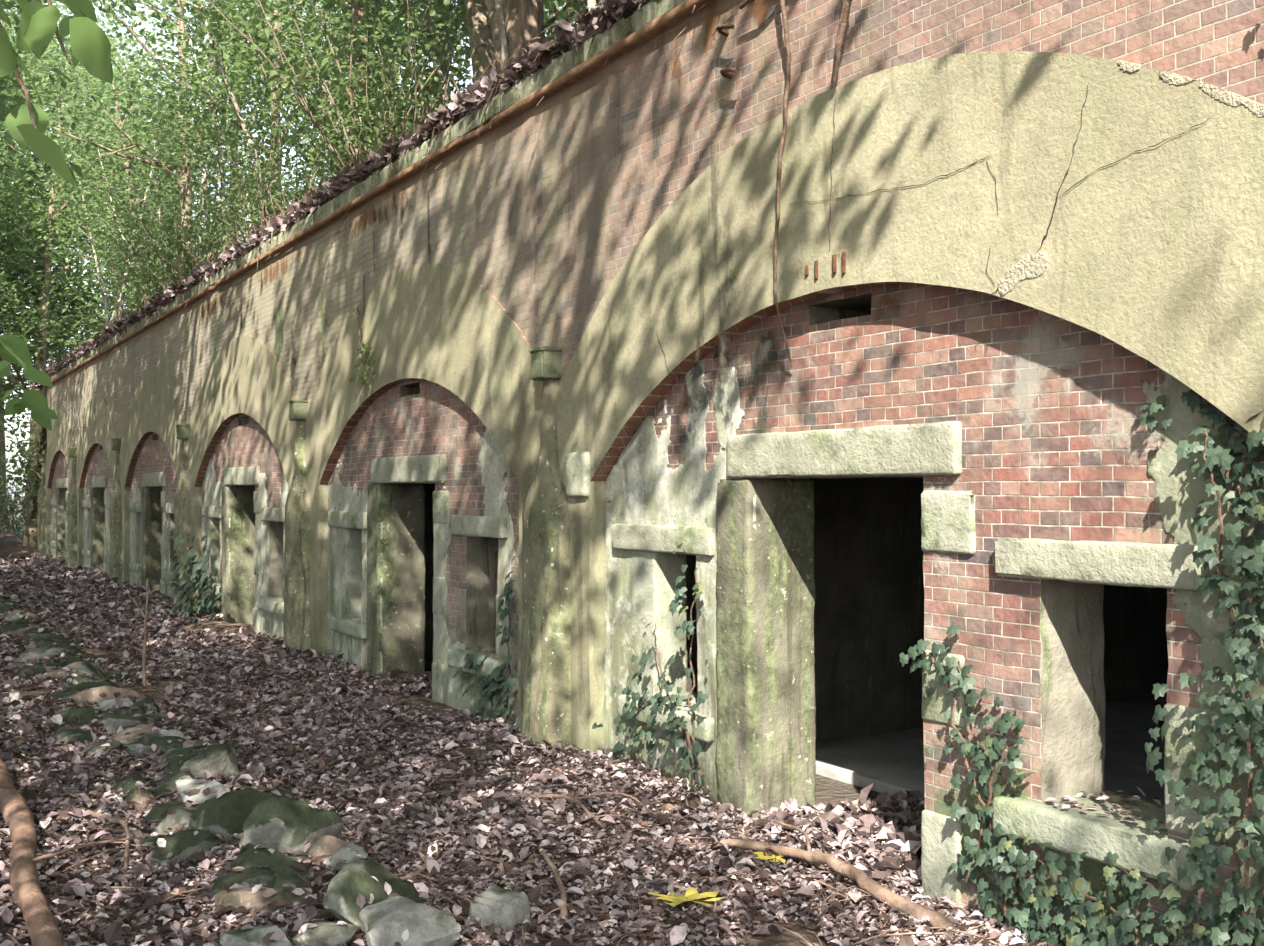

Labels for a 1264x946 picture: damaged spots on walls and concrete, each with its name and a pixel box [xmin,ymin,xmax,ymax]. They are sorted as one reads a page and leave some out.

rust [672,51,681,82]
rust [703,5,718,49]
crack [801,90,998,251]
crack [1037,87,1214,252]
leakage [674,143,784,460]